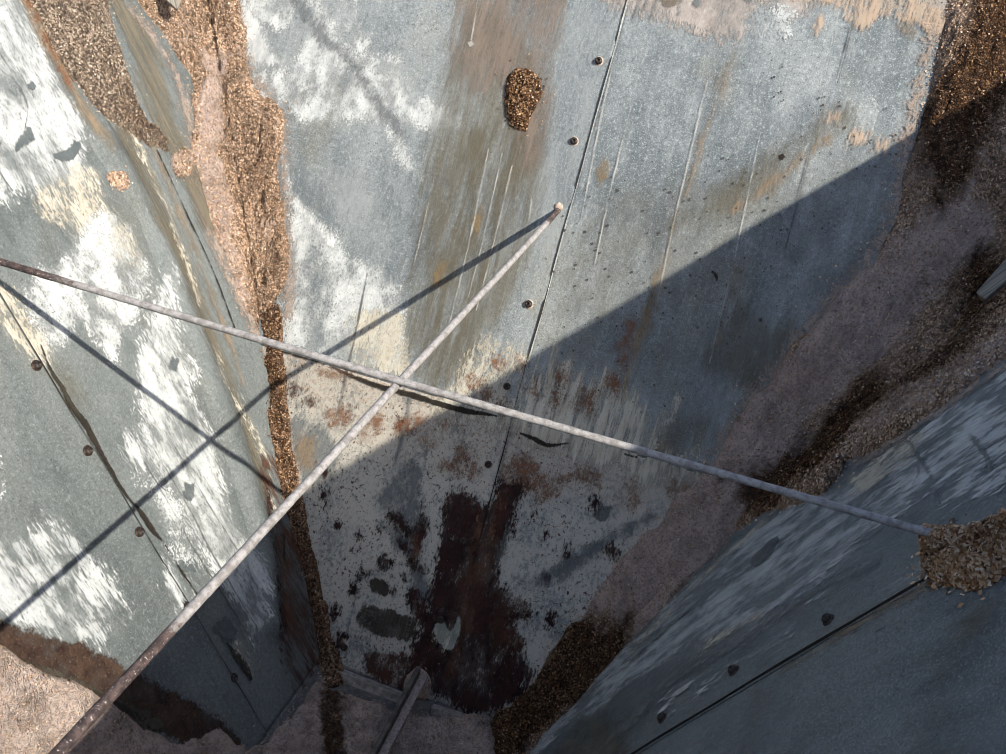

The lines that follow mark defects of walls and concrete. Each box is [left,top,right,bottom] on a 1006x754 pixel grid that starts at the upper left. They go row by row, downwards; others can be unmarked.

leakage [409,0,565,384]
corrosion [24,0,318,691]
corrosion [287,369,353,414]
corrosion [307,391,376,444]
corrosion [315,403,664,716]
corrosion [0,618,126,697]
corrosion [113,674,241,745]